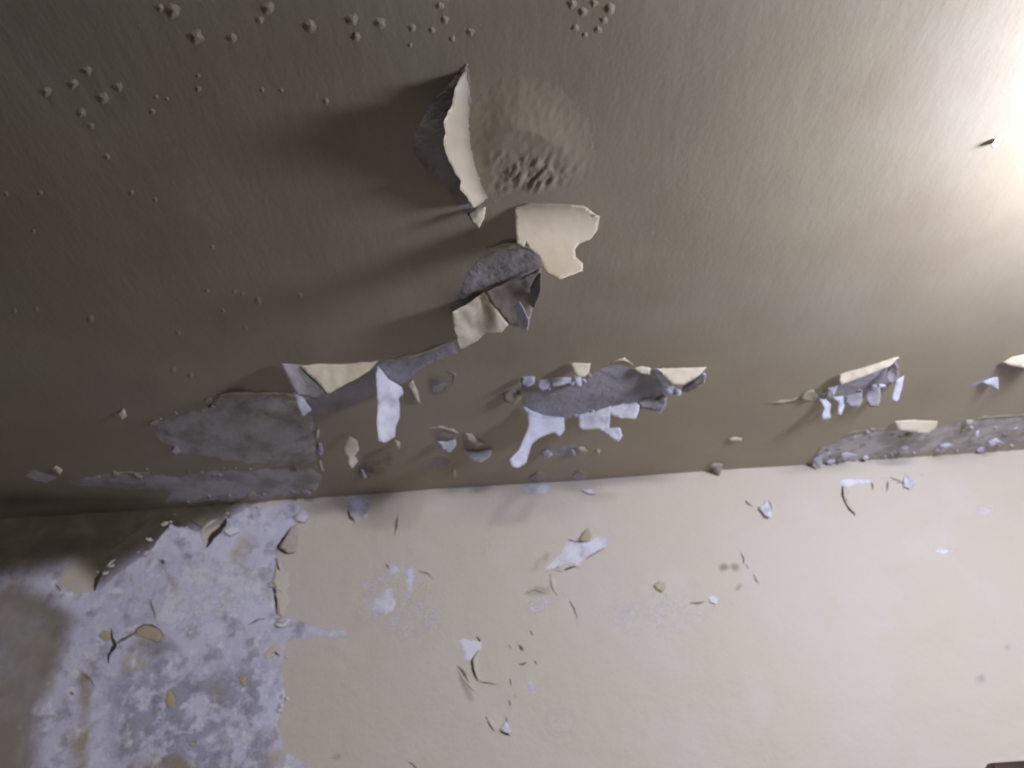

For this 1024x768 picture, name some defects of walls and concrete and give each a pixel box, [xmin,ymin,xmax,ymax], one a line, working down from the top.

peeling [411,64,488,228]
peeling [0,203,610,768]
peeling [503,357,706,494]
peeling [766,357,904,421]
peeling [812,414,1024,469]
peeling [967,354,1024,391]